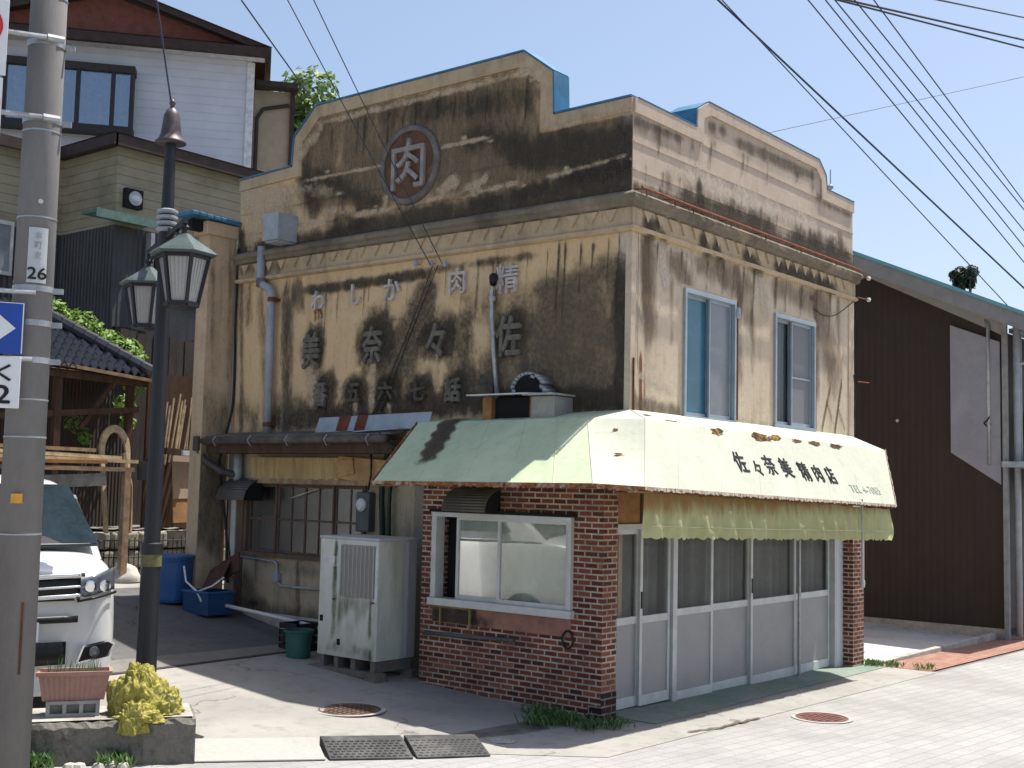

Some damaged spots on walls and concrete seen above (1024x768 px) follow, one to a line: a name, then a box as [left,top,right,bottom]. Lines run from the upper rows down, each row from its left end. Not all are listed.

water stain [298,73,681,233]
water stain [738,141,814,182]
water stain [272,235,839,432]
water stain [197,453,225,554]